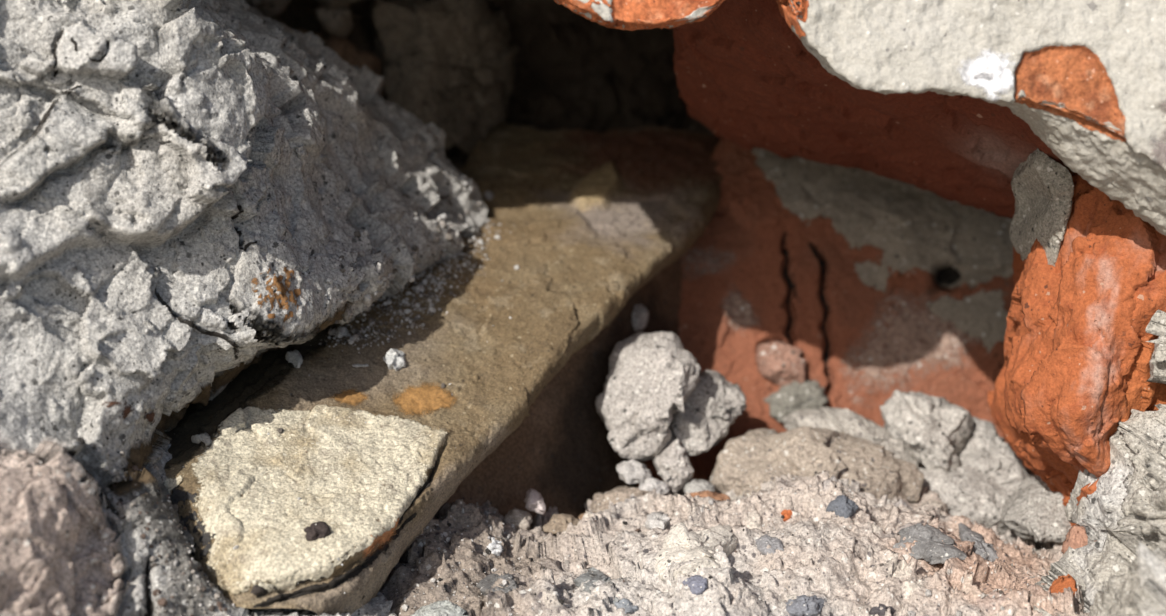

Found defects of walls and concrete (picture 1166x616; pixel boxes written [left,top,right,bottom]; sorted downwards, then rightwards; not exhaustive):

spalling [554,0,725,31]
spalling [775,0,809,39]
crack [0,30,109,167]
spalling [1015,45,1126,143]
crack [155,288,241,360]
corrosion [251,266,301,322]
crack [757,232,831,396]